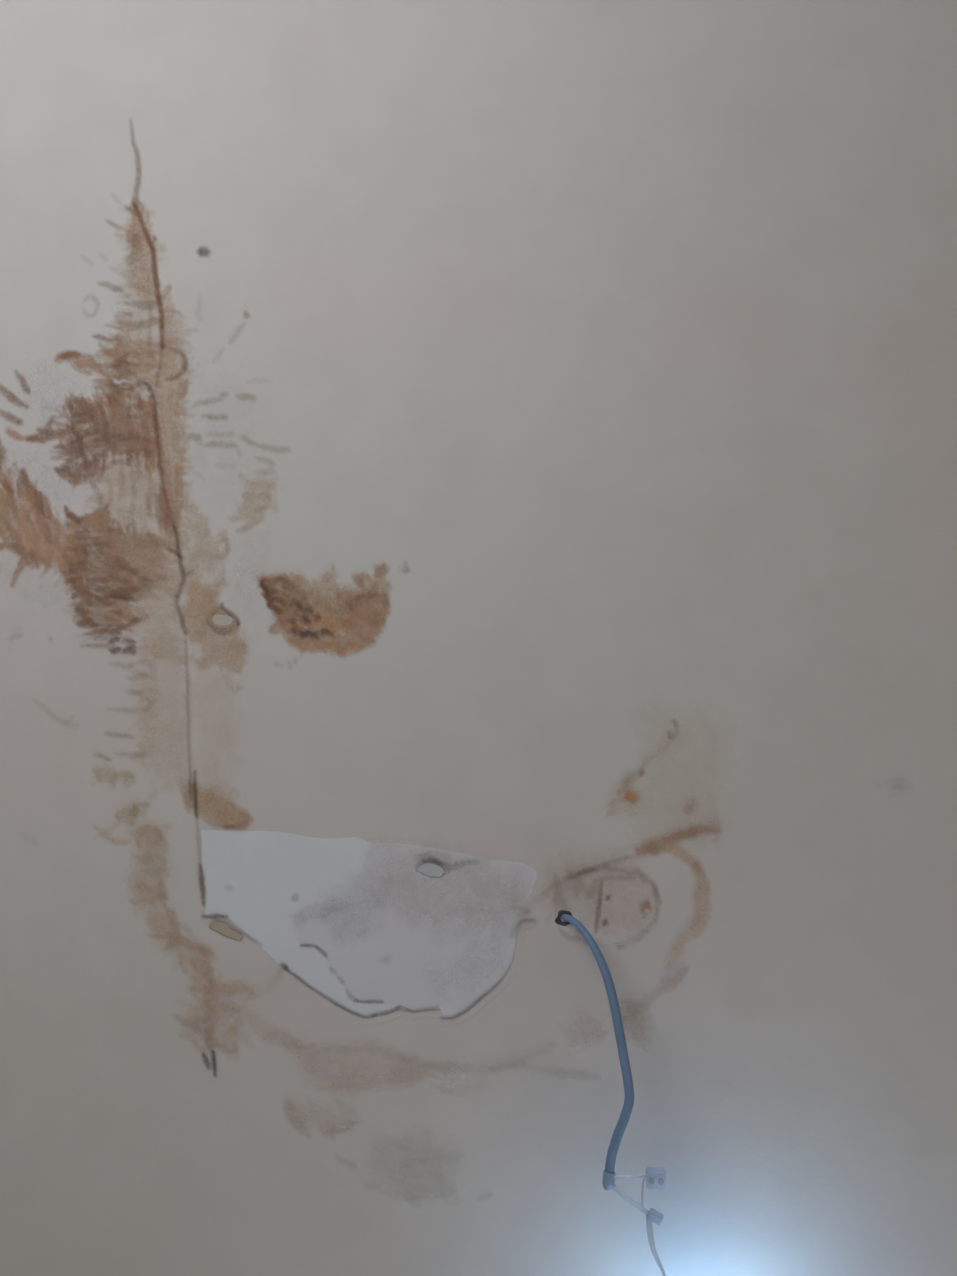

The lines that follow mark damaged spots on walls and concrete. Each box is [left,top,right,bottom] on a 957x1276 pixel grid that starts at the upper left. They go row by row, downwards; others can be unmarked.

crack [134,205,163,347]
leakage [0,327,245,666]
crack [197,865,205,905]
leakage [185,784,249,829]
peeling [201,829,537,1026]
leakage [637,819,720,871]